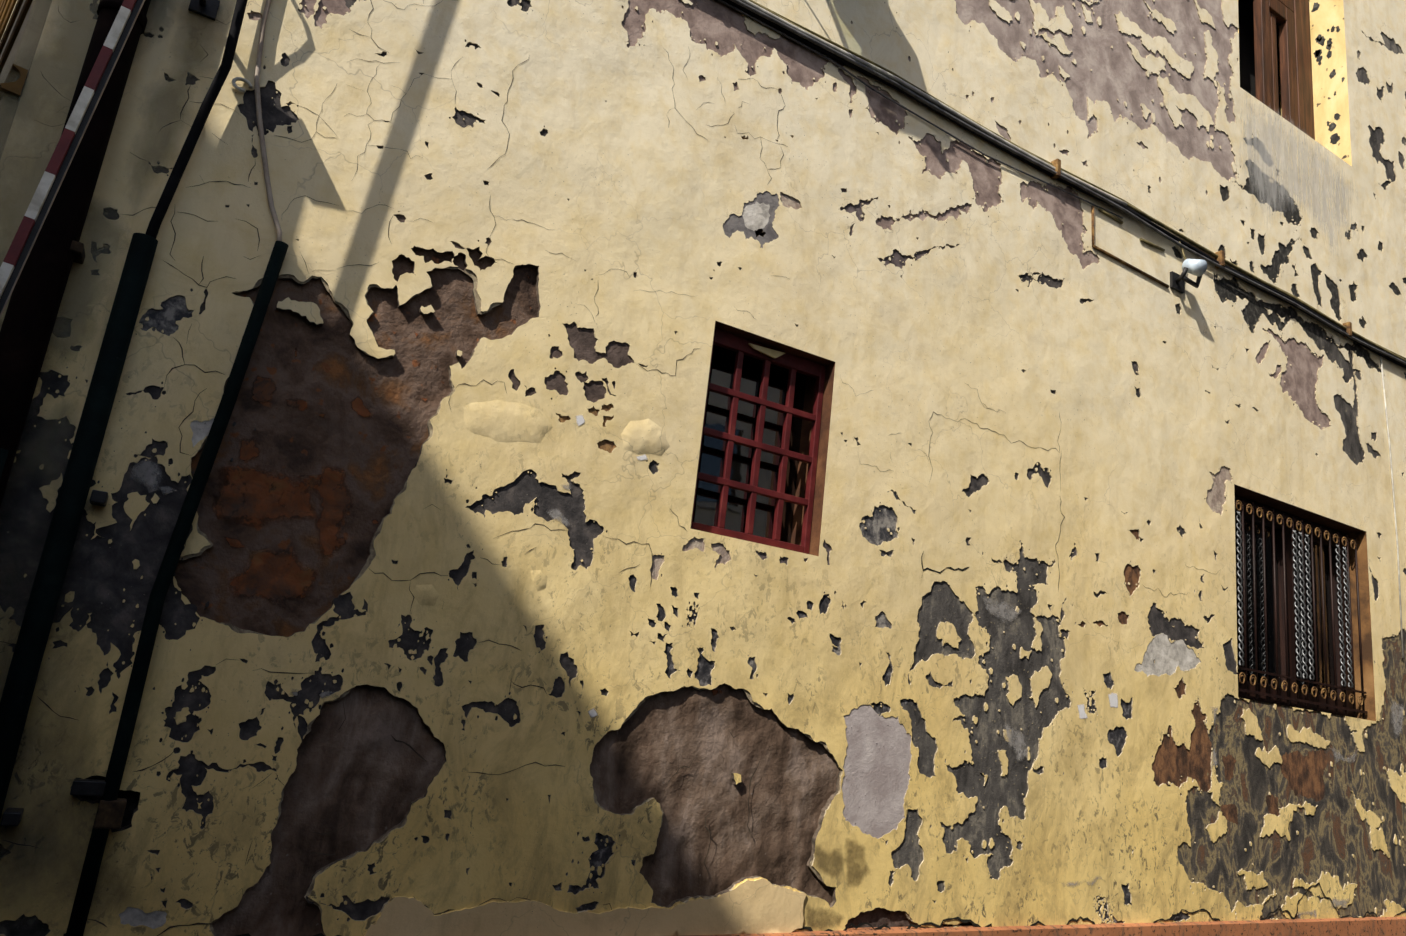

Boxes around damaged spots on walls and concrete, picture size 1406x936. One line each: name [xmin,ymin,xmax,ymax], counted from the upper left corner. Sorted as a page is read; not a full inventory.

crack [123,0,460,455]
spalling [48,237,541,936]
peeling [465,469,608,573]
peeling [508,322,648,453]
crack [486,60,689,319]
spalling [553,550,843,913]
peeling [621,0,1100,278]
peeling [859,490,916,557]
peeling [871,530,1156,887]
peeling [955,0,1385,465]
peeling [1134,574,1406,920]
peeling [1313,25,1406,102]